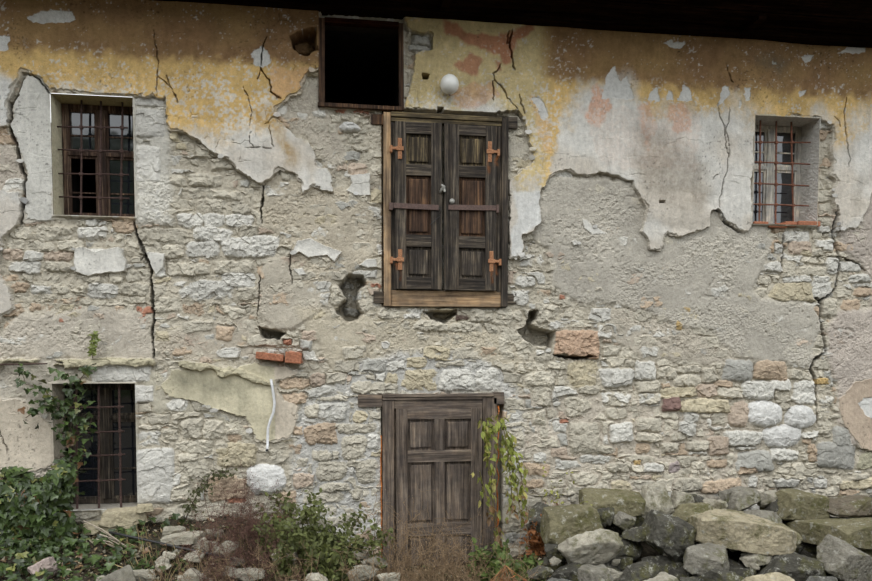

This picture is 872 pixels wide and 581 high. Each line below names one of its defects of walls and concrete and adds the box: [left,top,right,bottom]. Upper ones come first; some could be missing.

peeling [27,9,75,24]
crack [492,30,526,121]
crack [135,223,156,359]
spalling [0,67,383,361]
spalling [423,310,457,324]
spalling [508,116,537,181]
spalling [512,119,872,382]
crack [711,104,740,233]
crack [779,234,787,269]
crack [808,205,865,424]
crack [835,97,852,167]
spalling [160,392,254,466]